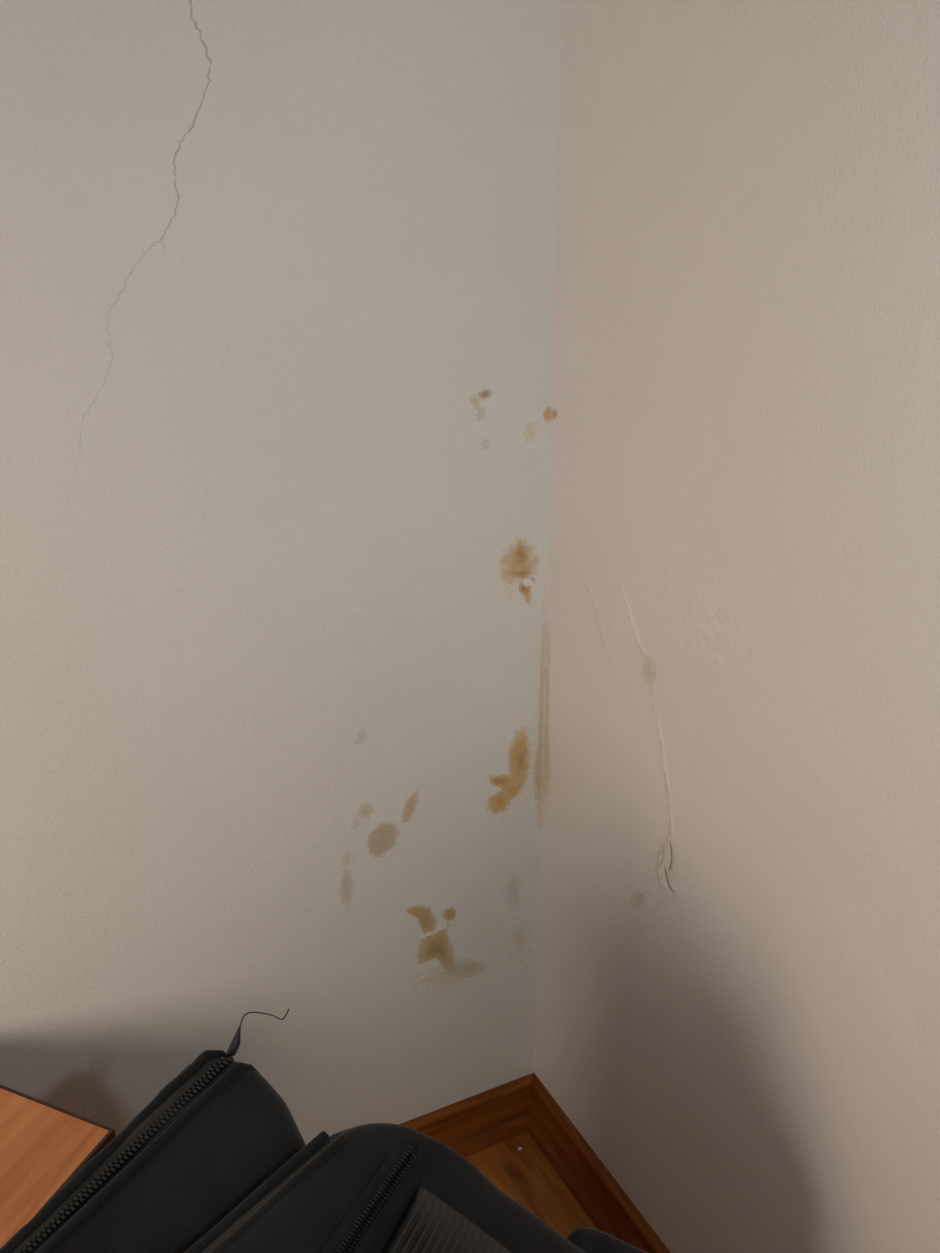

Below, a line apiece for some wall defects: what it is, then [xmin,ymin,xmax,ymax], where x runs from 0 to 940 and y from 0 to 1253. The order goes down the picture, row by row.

crack [161,0,212,241]
leakage [501,539,538,603]
leakage [488,665,544,816]
leakage [368,792,418,856]
leakage [406,906,483,977]